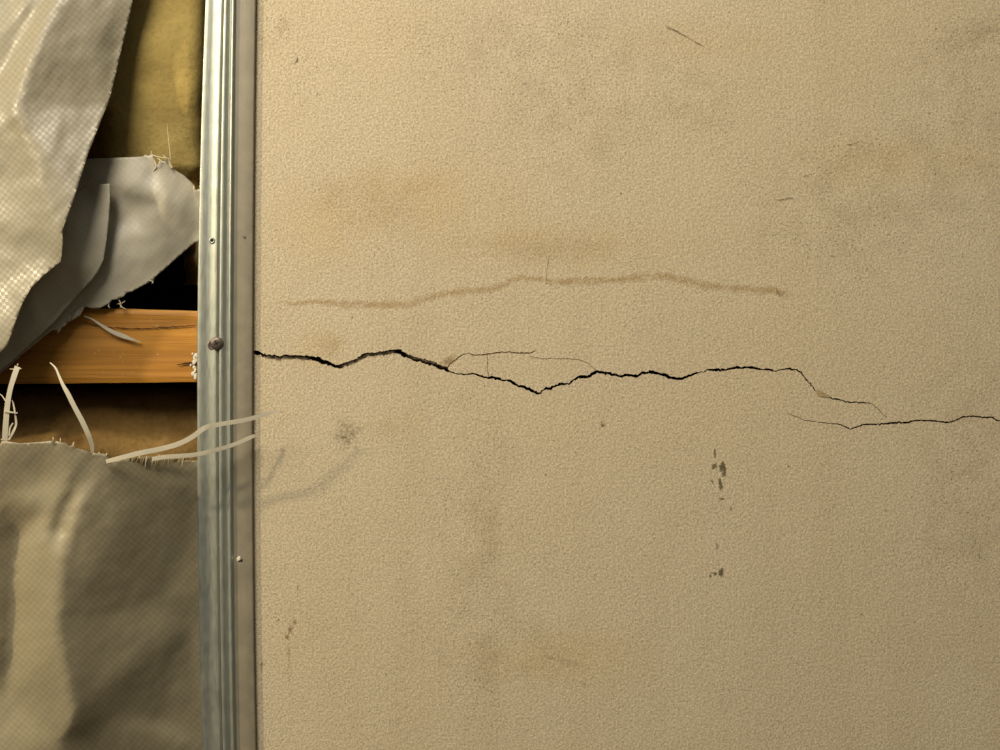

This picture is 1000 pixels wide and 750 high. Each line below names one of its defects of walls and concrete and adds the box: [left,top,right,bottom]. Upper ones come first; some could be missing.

crack [254,349,1000,430]